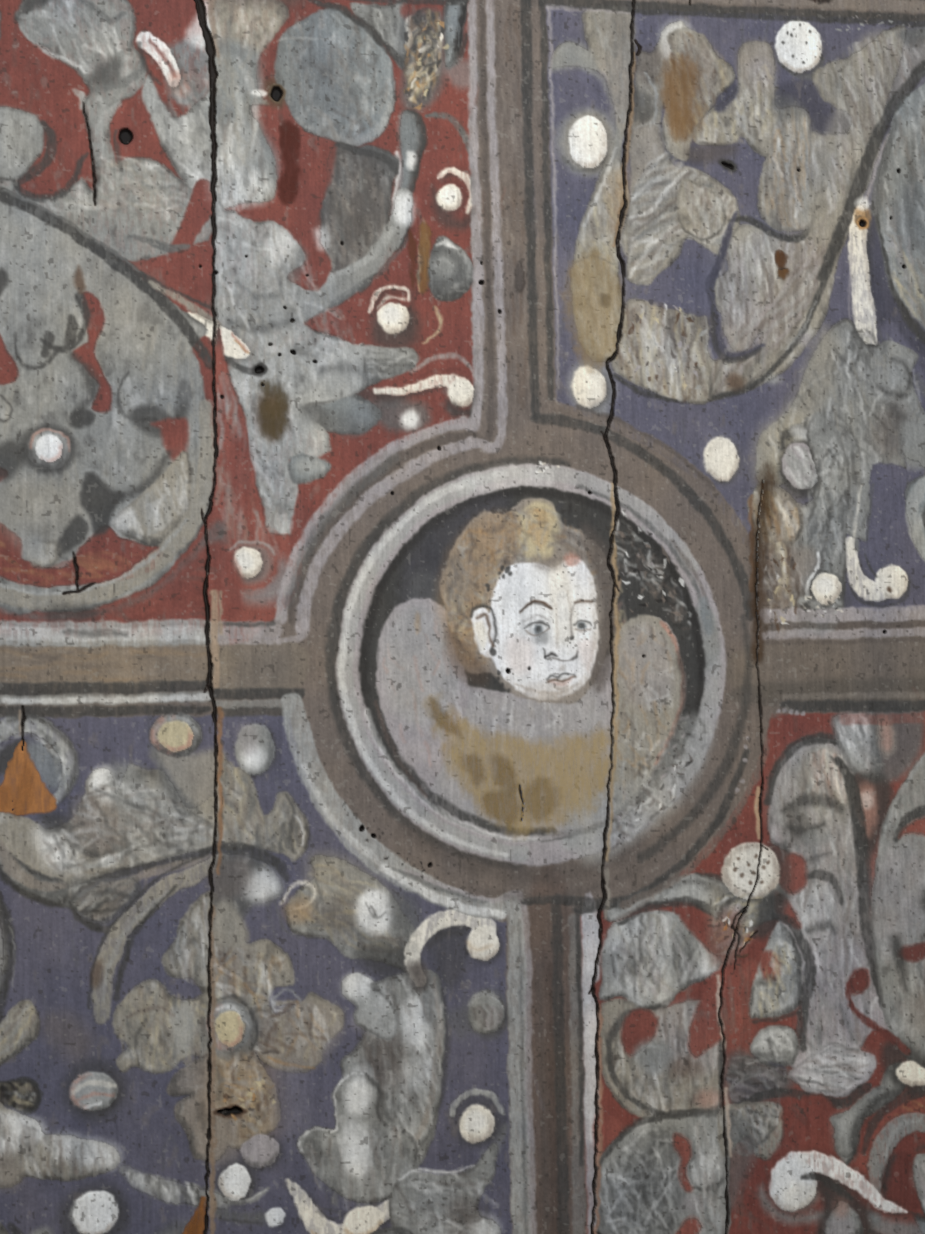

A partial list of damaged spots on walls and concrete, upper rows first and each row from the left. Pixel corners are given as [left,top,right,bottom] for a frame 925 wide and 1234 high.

rust [183,1197,206,1234]
crack [194,0,225,1234]
crack [591,0,643,1234]
crack [717,480,764,1234]